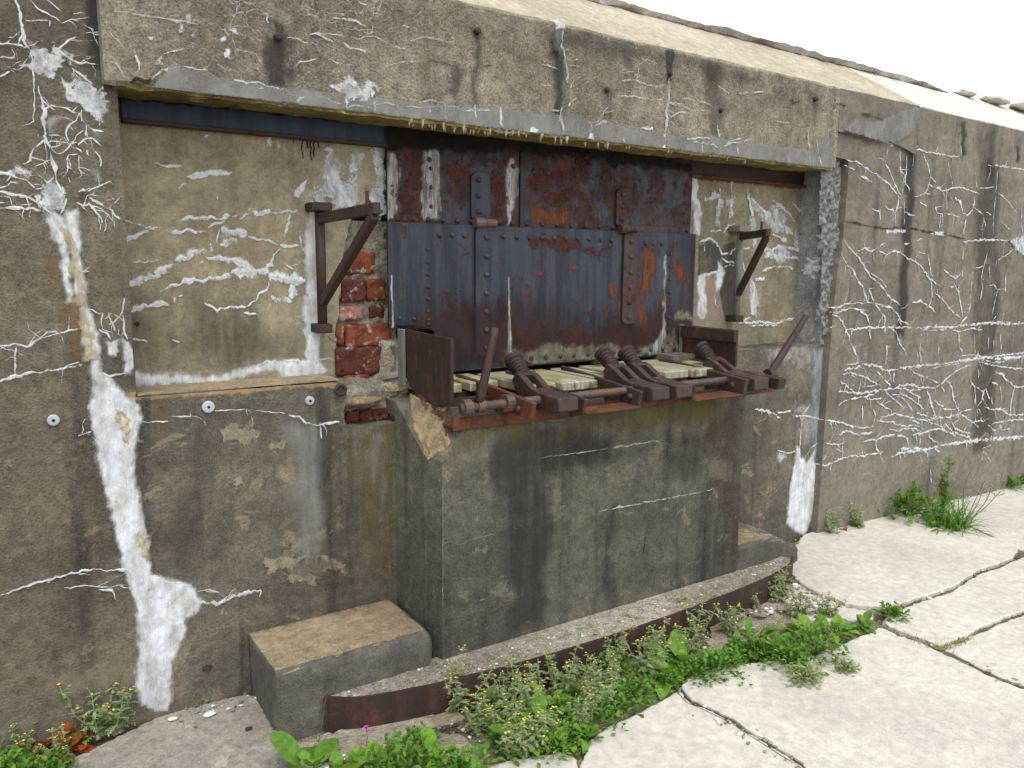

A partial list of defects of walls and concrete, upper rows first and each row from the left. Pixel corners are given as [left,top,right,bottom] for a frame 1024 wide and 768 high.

water stain [552,20,565,118]
crack [0,0,306,382]
corrosion [487,157,509,221]
corrosion [525,155,616,271]
spalling [328,220,450,460]
corrosion [414,241,694,368]
crack [755,100,1024,482]
crack [139,393,340,438]
water stain [35,126,799,711]
water stain [778,447,816,535]
crack [0,564,132,600]
peeling [262,555,345,586]